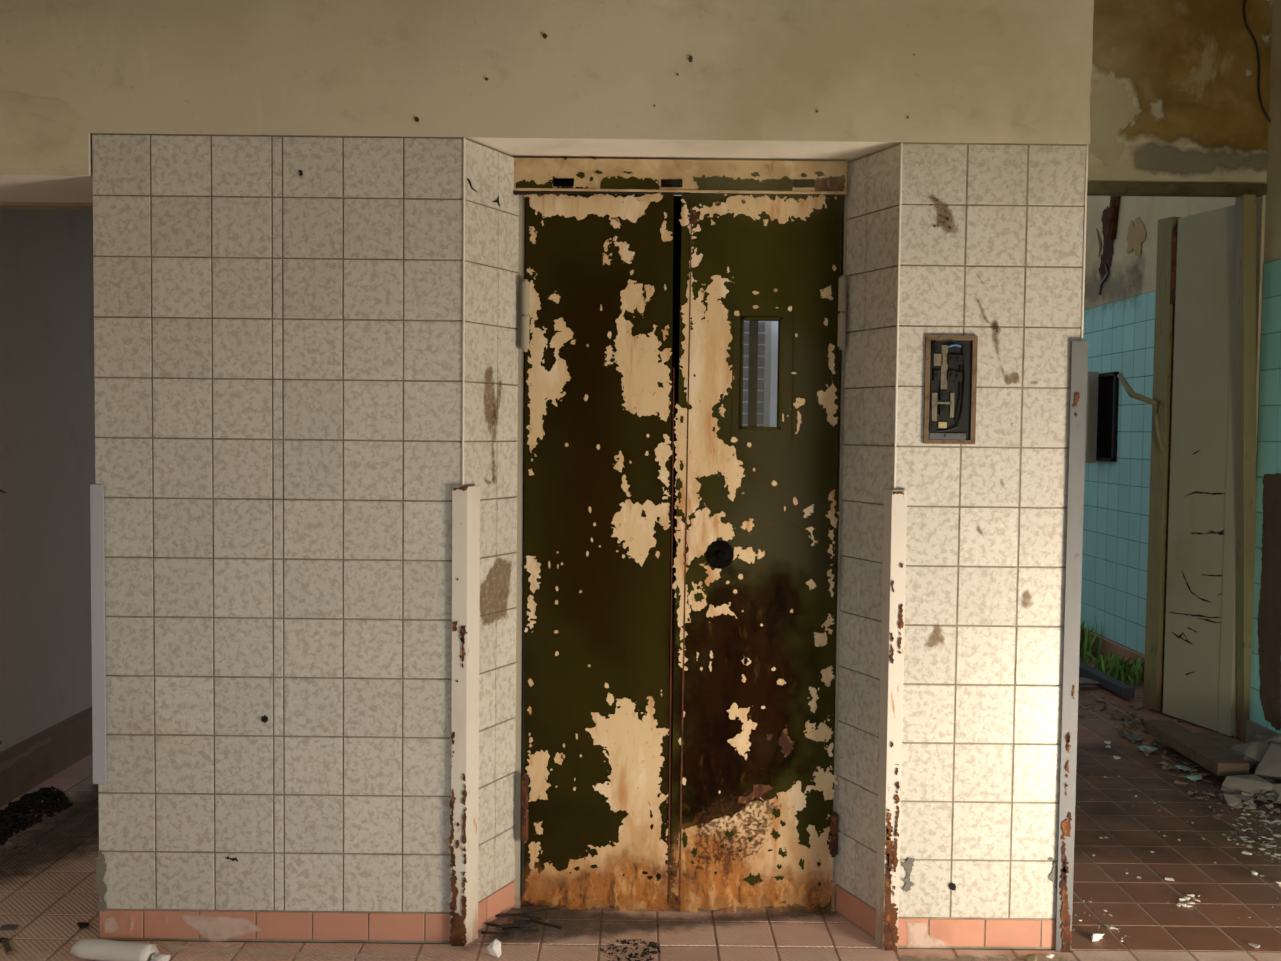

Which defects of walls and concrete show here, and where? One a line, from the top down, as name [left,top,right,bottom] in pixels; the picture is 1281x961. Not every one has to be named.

peeling [1099,206,1146,280]
peeling [524,193,840,671]
rust [452,621,467,682]
rust [480,558,511,625]
rust [528,367,834,912]
rust [889,563,904,664]
peeling [1257,473,1281,730]
rust [449,732,467,946]
peeling [523,666,838,912]
rust [883,764,900,951]
rust [1060,812,1073,953]